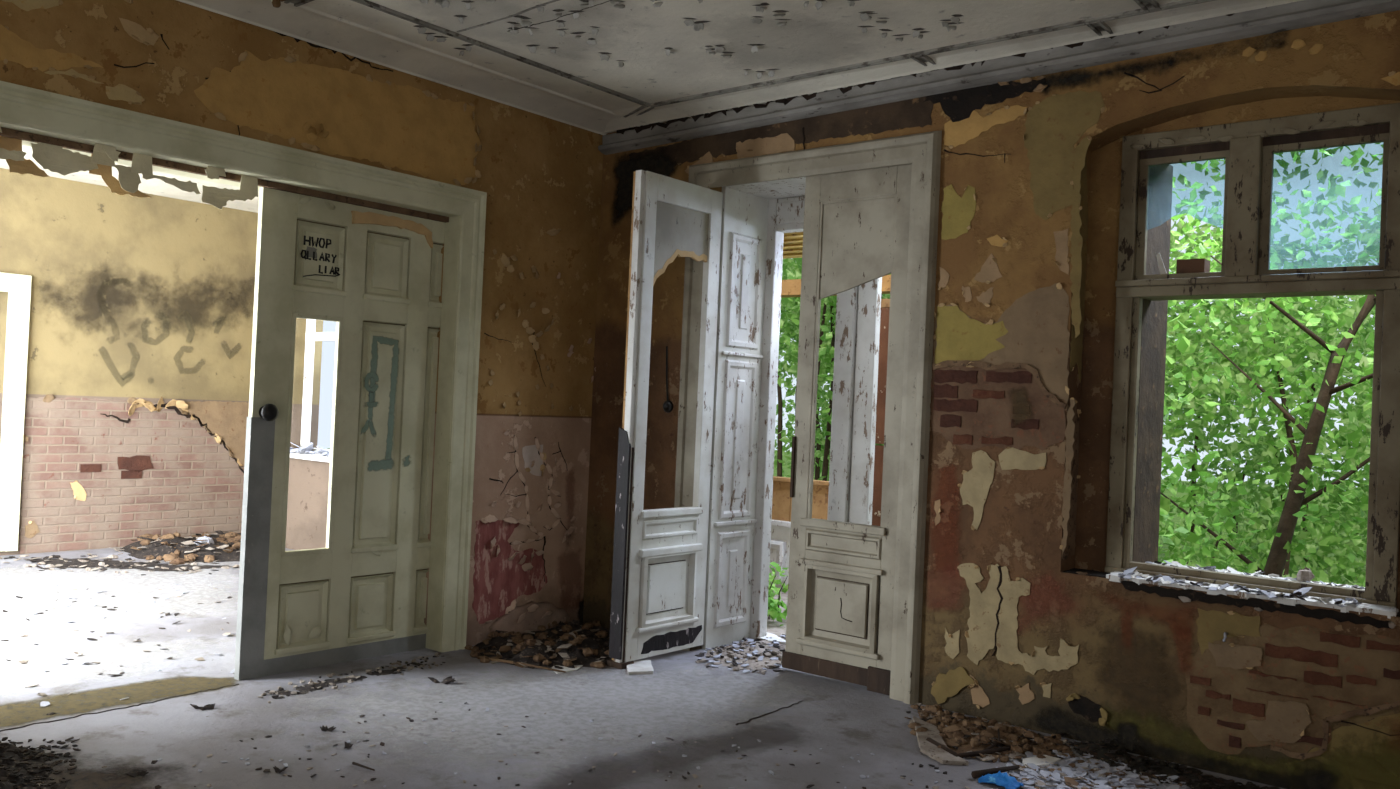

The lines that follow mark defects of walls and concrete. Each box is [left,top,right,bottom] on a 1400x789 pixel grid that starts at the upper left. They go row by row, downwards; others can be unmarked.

peeling [0,24,145,104]
peeling [507,0,625,67]
peeling [684,0,779,79]
peeling [751,0,825,26]
peeling [848,0,963,42]
peeling [194,50,482,186]
peeling [0,126,258,210]
flaking render [19,394,249,554]
flaking render [930,135,1400,763]
peeling [472,514,547,624]
crack [992,566,1003,656]
leakage [1035,630,1337,789]